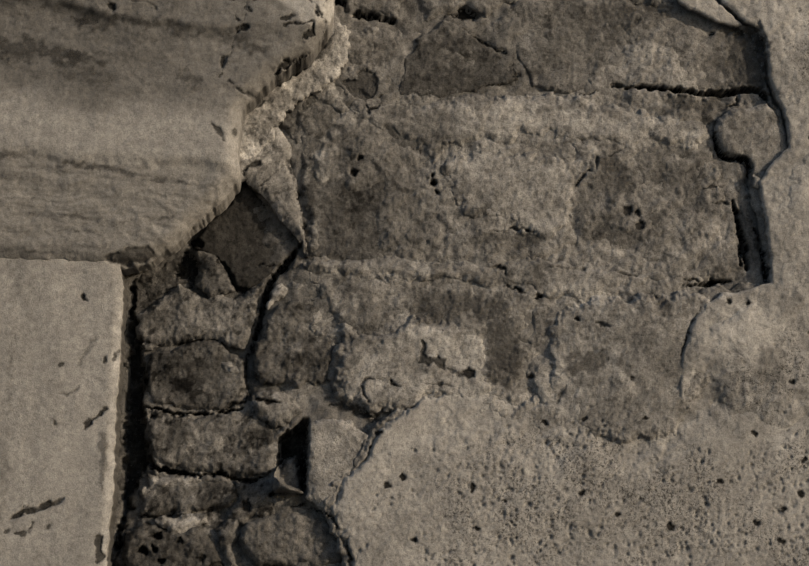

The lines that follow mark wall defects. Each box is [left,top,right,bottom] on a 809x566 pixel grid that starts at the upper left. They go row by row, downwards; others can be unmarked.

spalling [353,11,395,25]
spalling [449,7,477,21]
crack [218,6,265,106]
crack [274,0,327,86]
spalling [341,68,378,100]
crack [611,85,736,106]
spalling [677,0,784,131]
spalling [623,206,645,230]
spalling [105,248,157,267]
spalling [175,238,204,289]
spalling [418,340,475,379]
spalling [322,408,404,566]